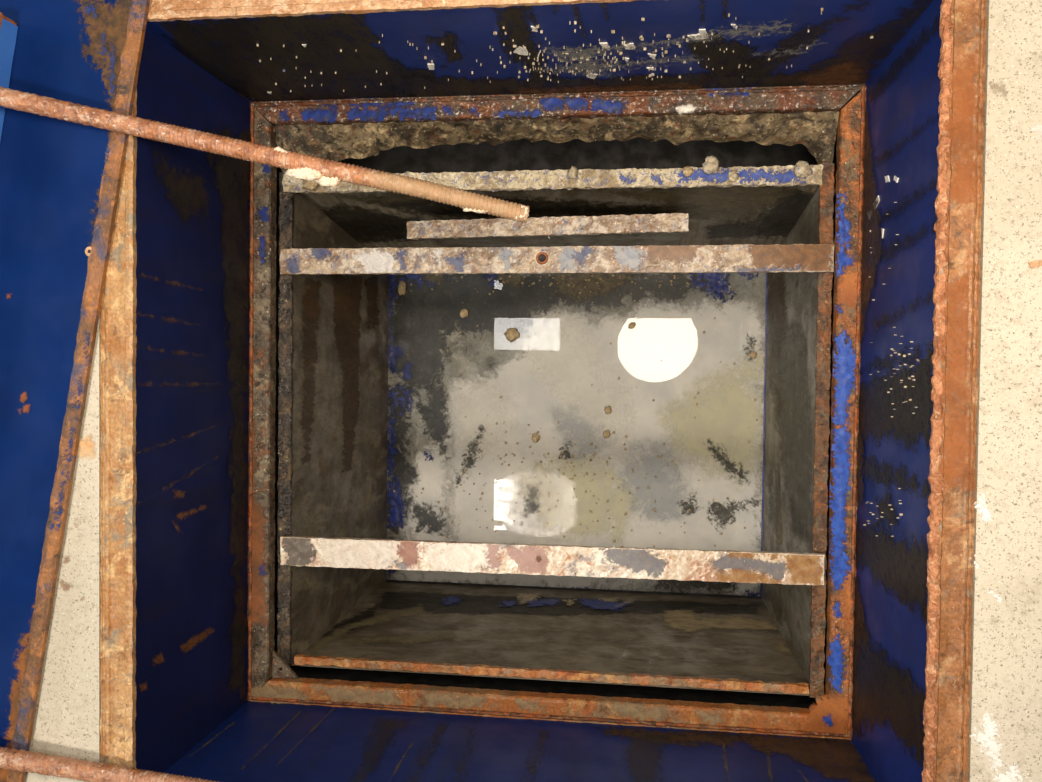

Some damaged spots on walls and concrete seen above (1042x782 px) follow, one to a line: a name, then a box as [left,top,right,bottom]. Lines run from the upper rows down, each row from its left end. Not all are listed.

rust [78,0,132,110]
leakage [384,0,940,99]
peeling [651,168,806,185]
peeling [835,193,855,276]
rust [837,110,882,344]
rust [302,278,321,463]
rust [333,274,379,472]
leakage [859,342,933,375]
peeling [829,329,856,618]
leakage [861,450,931,531]
rust [6,604,36,748]
peeling [827,633,846,693]